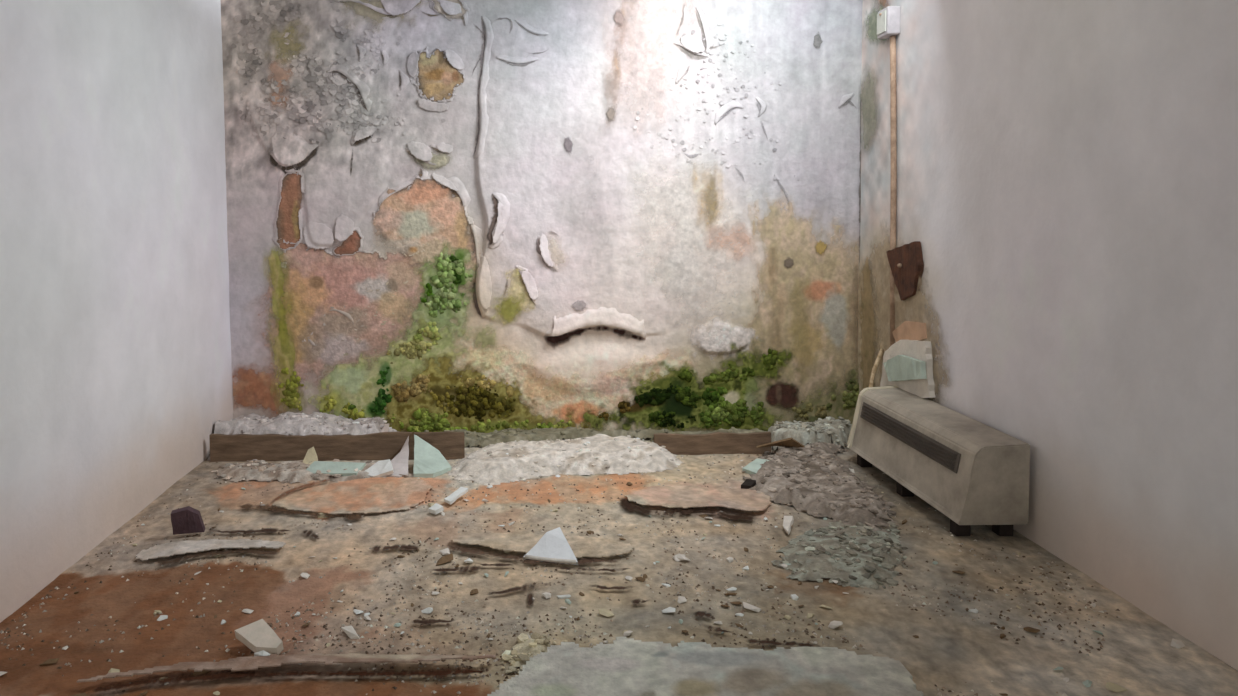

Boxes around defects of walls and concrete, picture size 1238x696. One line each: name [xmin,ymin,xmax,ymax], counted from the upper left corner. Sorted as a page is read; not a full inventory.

crack [269,144,318,175]
flaking render [231,0,538,383]
crack [326,0,647,346]
peeling [539,234,553,267]